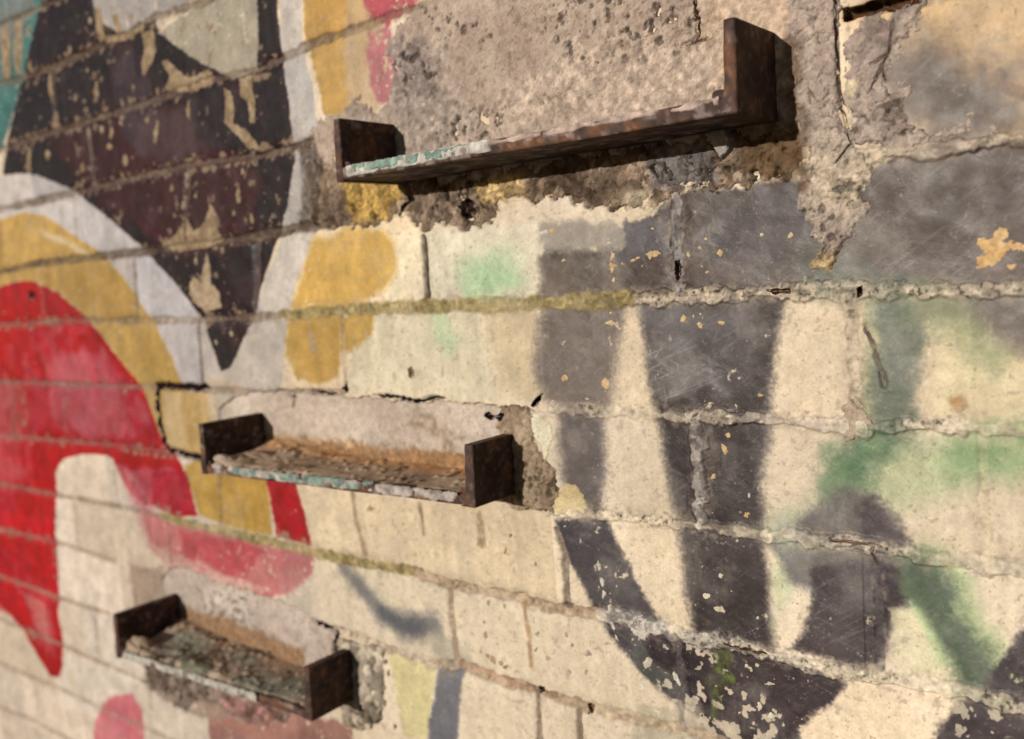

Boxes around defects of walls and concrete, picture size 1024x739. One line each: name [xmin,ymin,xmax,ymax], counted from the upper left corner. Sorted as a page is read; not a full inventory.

spalling [310,0,800,233]
corrosion [742,43,806,190]
crack [833,0,853,164]
crack [870,20,895,91]
peeling [609,251,661,282]
corrosion [281,440,465,469]
peeling [531,413,553,461]
corrosion [181,607,303,666]
peeling [585,561,625,675]